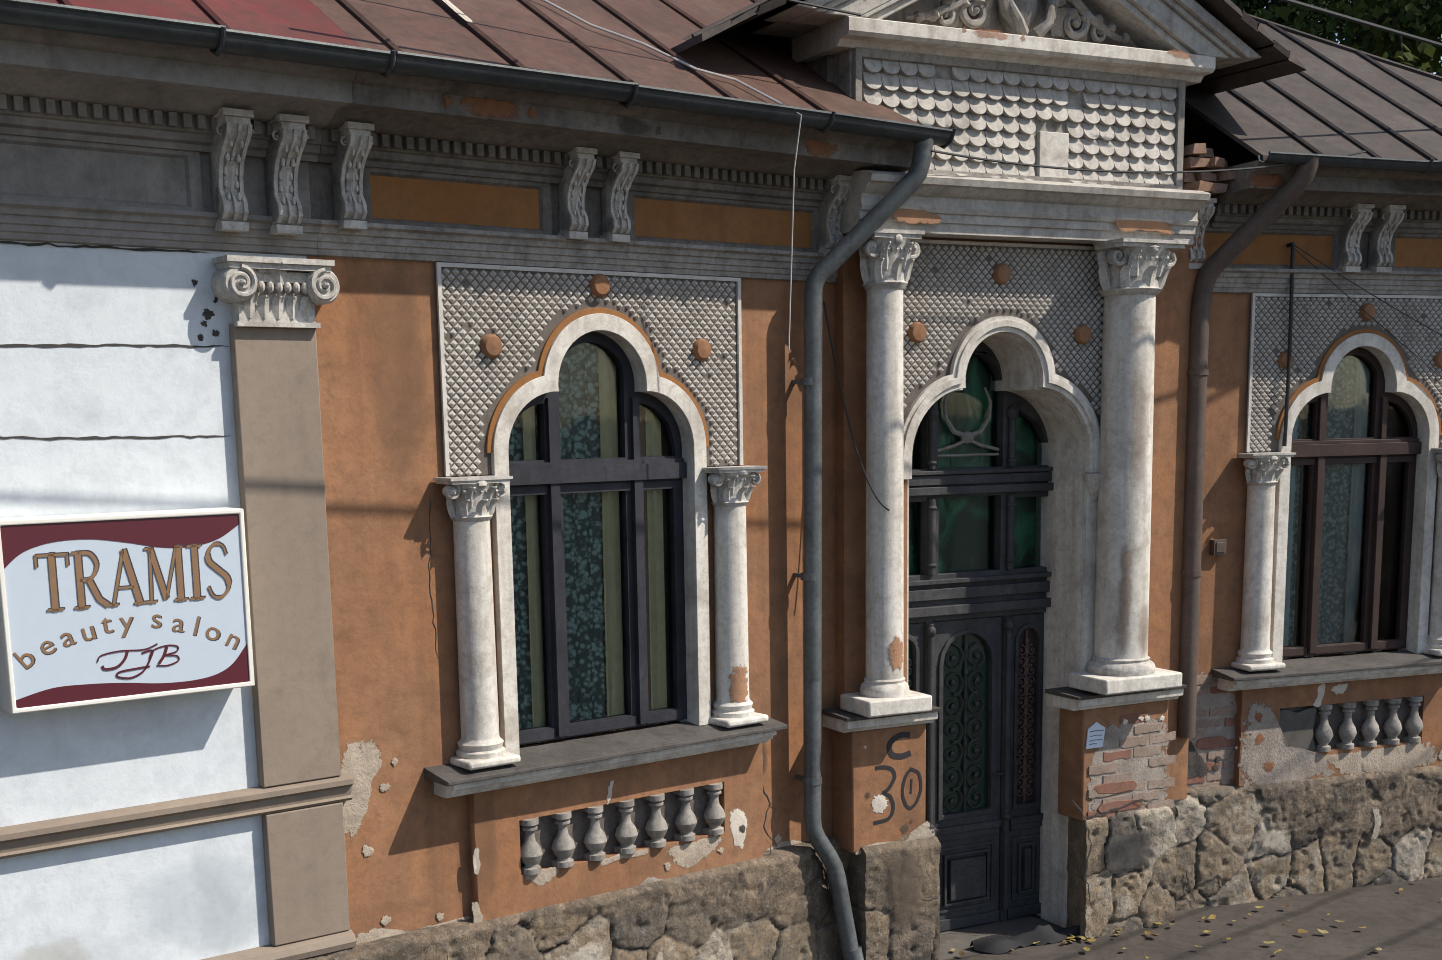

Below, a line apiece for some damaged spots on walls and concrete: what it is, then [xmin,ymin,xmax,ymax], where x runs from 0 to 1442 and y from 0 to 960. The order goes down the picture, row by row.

peeling [729,664,749,703]
peeling [888,635,903,670]
flaking render [1086,668,1442,820]
peeling [341,739,398,857]
spalling [599,848,649,866]
spalling [640,808,748,885]